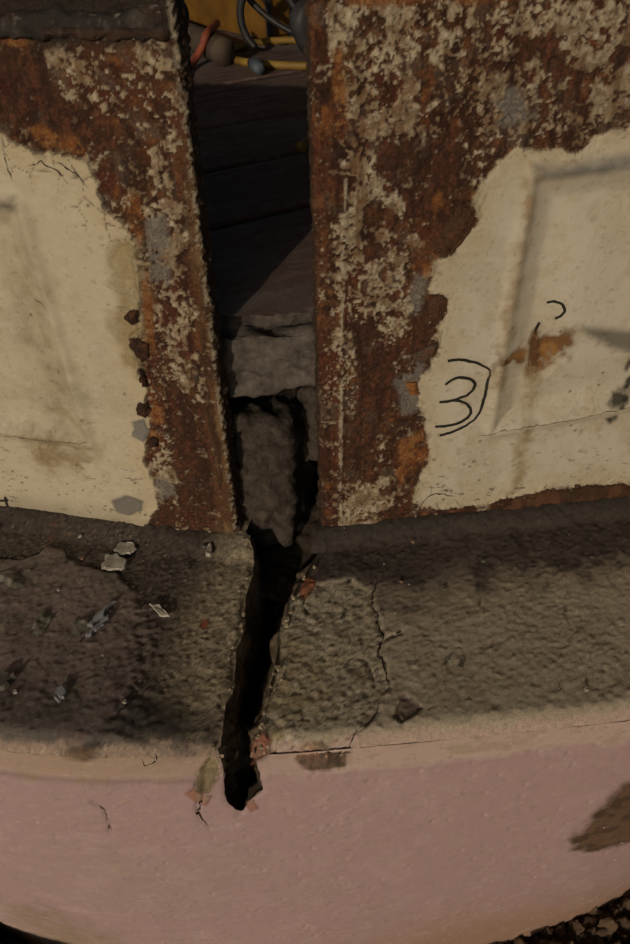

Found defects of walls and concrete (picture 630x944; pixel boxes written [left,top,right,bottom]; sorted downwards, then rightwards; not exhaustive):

rust [0,0,243,533]
rust [303,0,630,527]
spalling [186,749,219,806]
crack [195,535,317,826]
spalling [252,732,271,764]
spalling [295,743,347,771]
crack [336,583,401,758]